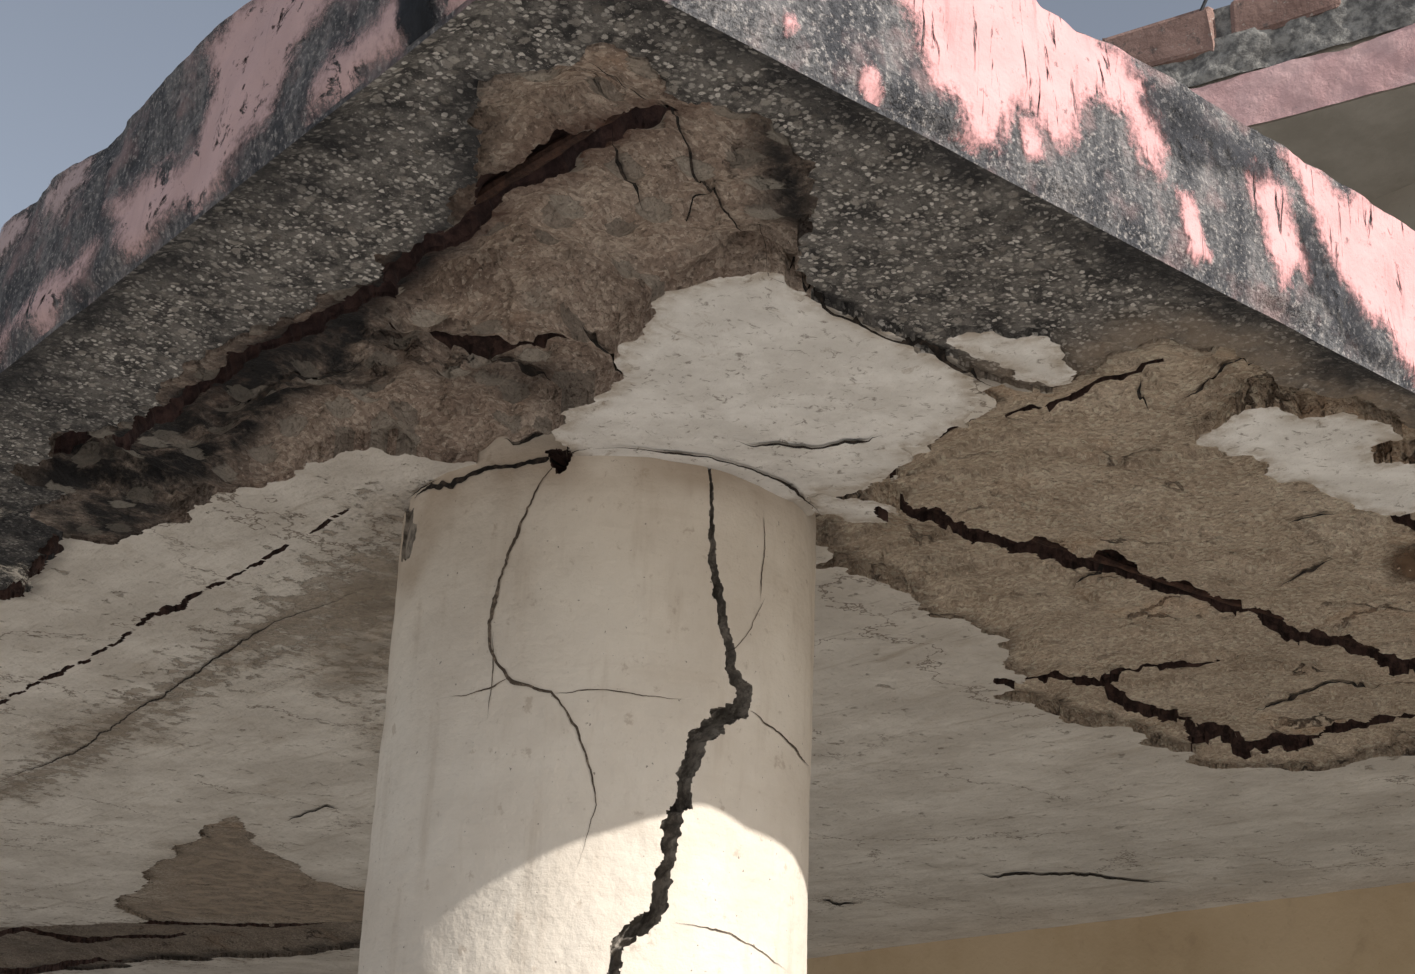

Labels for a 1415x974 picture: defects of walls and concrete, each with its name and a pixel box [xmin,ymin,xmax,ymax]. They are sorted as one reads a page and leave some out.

spalling [0,0,818,545]
peeling [1176,191,1213,264]
peeling [1246,150,1415,374]
crack [0,508,349,705]
crack [4,583,385,780]
peeling [401,508,417,562]
crack [407,433,878,974]
spalling [812,338,1415,772]
flaking render [0,816,365,974]
crack [285,805,333,822]
crack [971,873,1177,883]